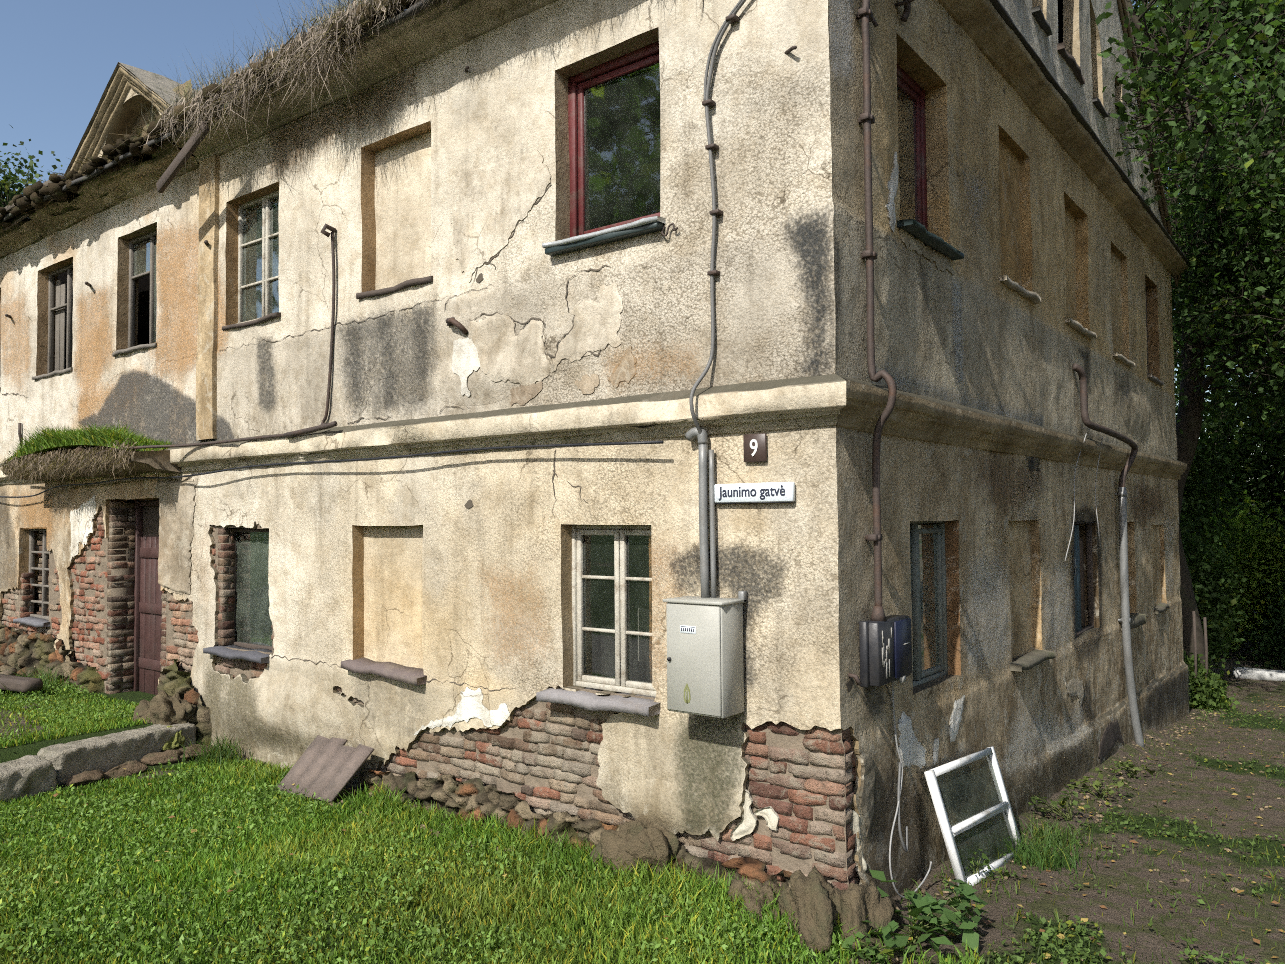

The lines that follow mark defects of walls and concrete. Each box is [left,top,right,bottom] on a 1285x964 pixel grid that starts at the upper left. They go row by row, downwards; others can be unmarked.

crack [162,185,622,363]
peeling [452,283,623,406]
leakage [785,212,840,374]
peeling [885,152,954,275]
flaking render [1,495,111,693]
peeling [155,478,199,685]
flaking render [212,525,269,581]
flaking render [215,625,275,680]
flaking render [379,686,655,833]
flaking render [675,721,877,890]
peeling [897,695,965,769]
leakage [956,682,1093,842]